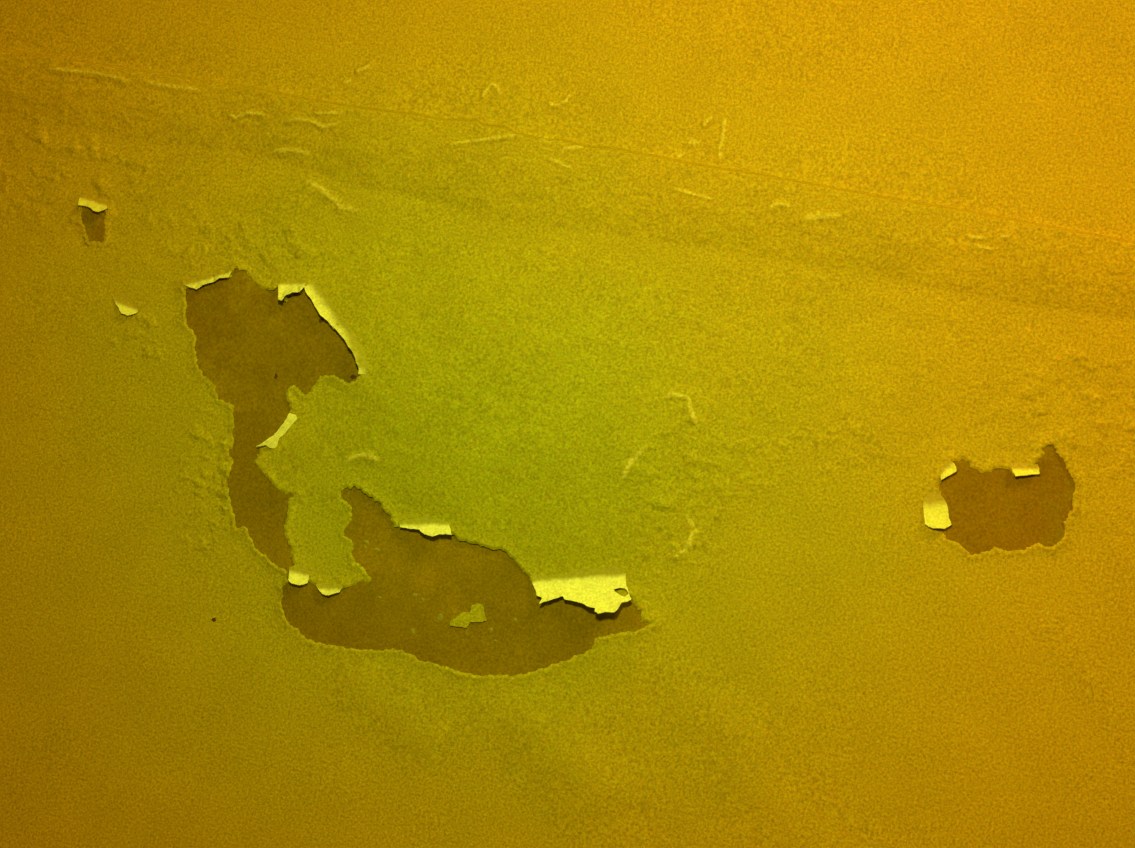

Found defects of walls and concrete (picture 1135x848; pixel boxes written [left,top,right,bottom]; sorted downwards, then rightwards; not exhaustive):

peeling [70,196,118,256]
peeling [113,295,138,316]
peeling [166,248,676,694]
peeling [915,426,1097,576]